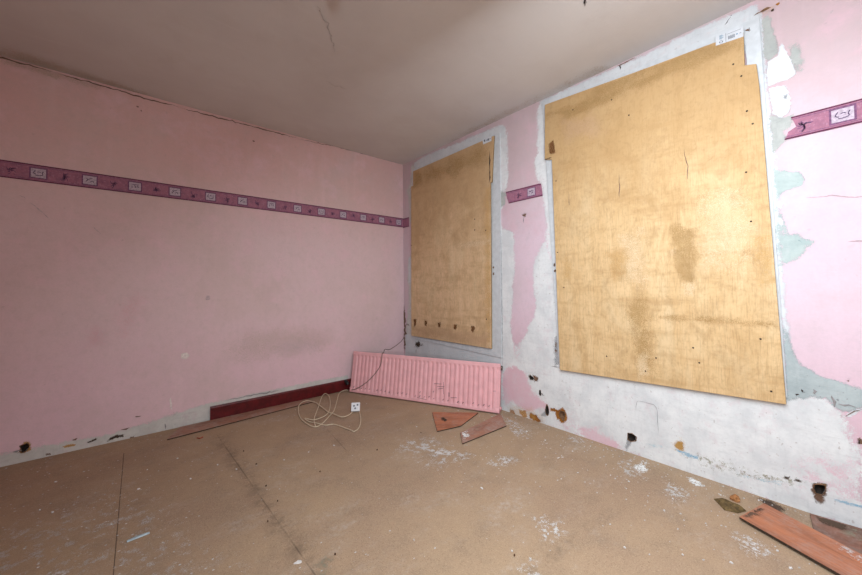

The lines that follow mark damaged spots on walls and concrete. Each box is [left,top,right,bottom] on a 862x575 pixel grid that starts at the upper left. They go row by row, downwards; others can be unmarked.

peeling [405,4,862,528]